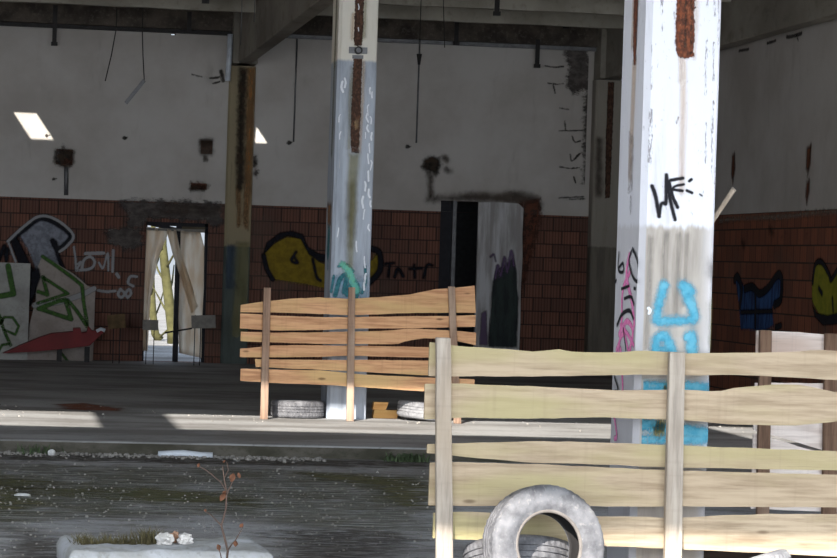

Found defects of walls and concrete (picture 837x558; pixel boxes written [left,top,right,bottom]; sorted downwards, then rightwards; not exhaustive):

rust [353,0,364,46]
rust [675,0,696,59]
rust [350,59,362,153]
rust [236,68,255,229]
leakage [421,156,448,199]
peeling [103,182,224,251]
peeling [434,191,541,287]